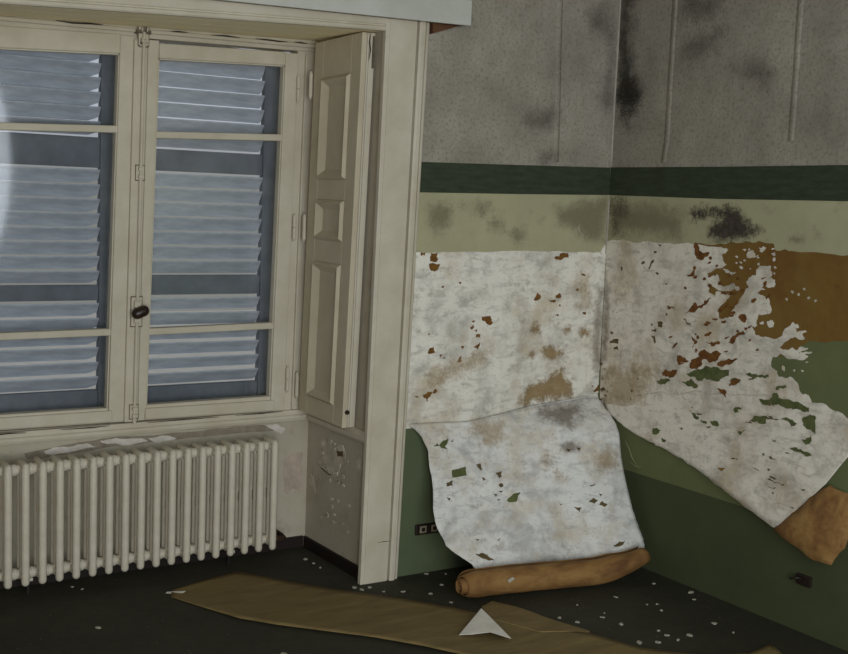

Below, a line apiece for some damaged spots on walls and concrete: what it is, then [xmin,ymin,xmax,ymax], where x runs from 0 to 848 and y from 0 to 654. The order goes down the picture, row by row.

damp [618,0,639,105]
damp [692,204,760,241]
peeling [406,239,816,457]
peeling [446,467,467,486]
peeling [494,471,520,502]